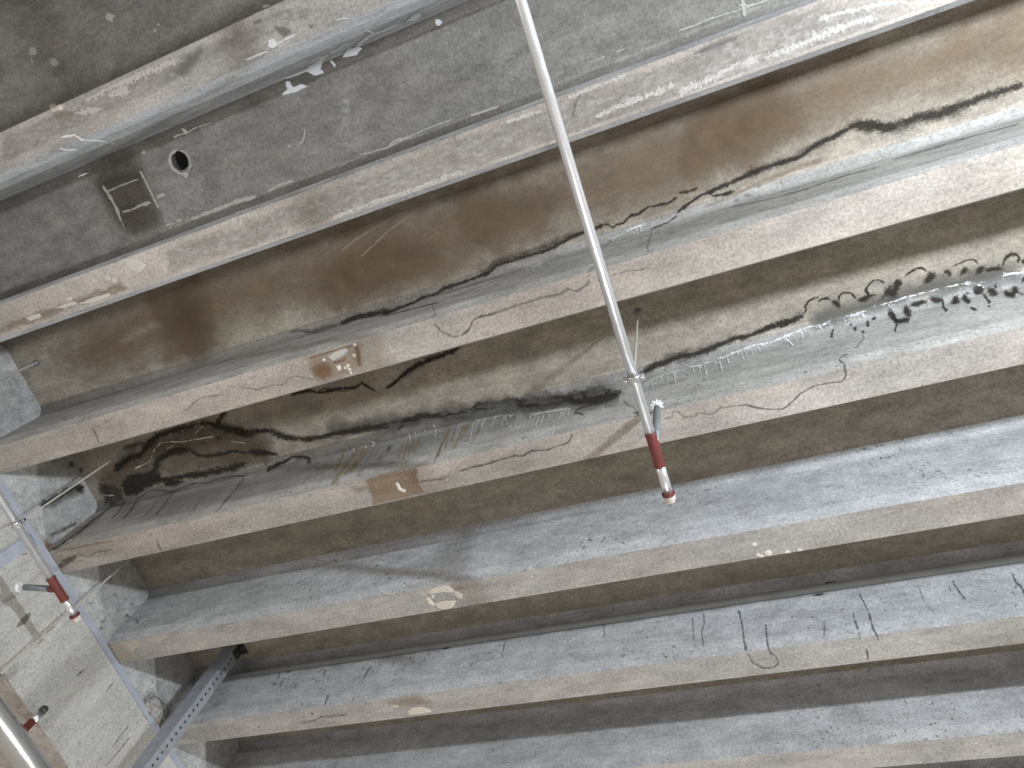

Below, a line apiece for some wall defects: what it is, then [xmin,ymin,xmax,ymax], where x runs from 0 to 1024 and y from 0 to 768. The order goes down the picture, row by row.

water stain [678,0,768,31]
peeling [3,4,317,156]
water stain [59,134,125,151]
water stain [91,6,1024,357]
water stain [641,253,1024,387]
water stain [291,347,459,396]
crack [666,334,864,419]
crack [421,435,573,482]
crack [113,475,245,518]
spalling [425,585,463,609]
crack [738,611,779,669]
crack [853,593,879,659]